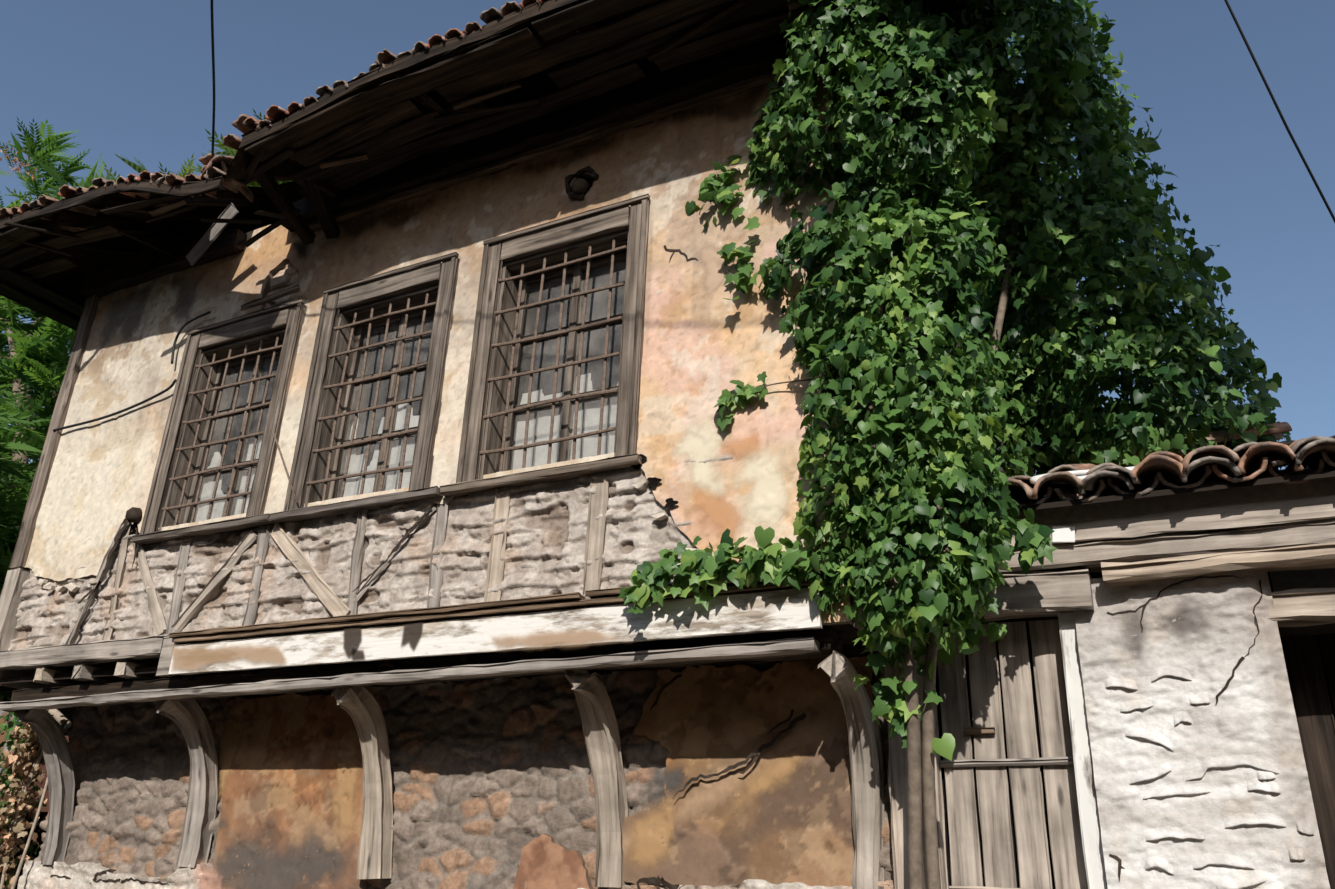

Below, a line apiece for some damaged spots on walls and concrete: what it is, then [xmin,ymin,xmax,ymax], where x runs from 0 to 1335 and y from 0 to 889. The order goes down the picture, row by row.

peeling [674,421,787,537]
spalling [8,454,699,650]
crack [1107,575,1263,705]
crack [673,709,807,799]
spalling [513,833,594,889]